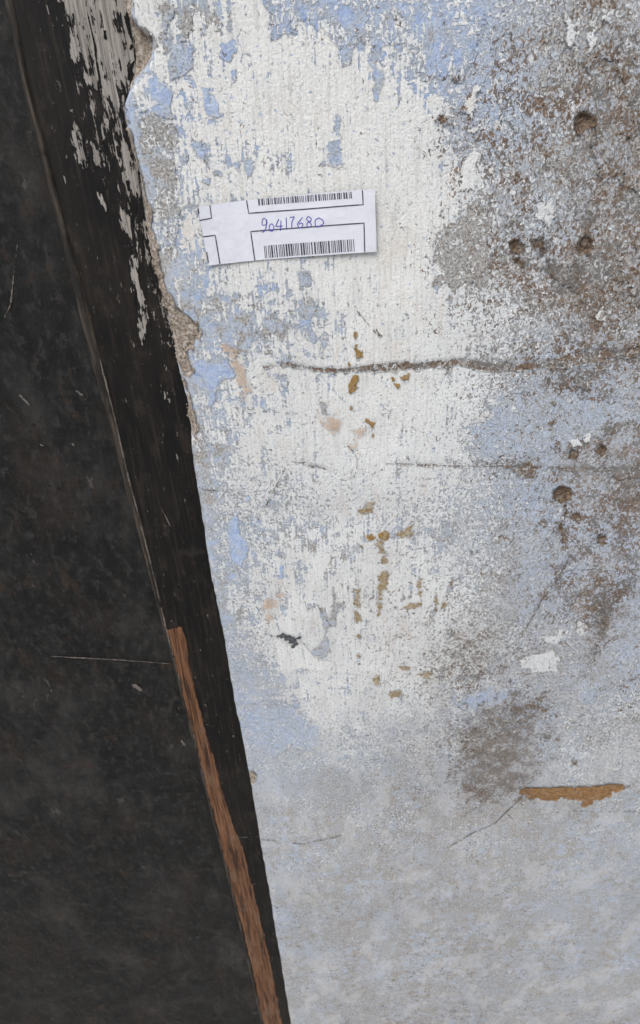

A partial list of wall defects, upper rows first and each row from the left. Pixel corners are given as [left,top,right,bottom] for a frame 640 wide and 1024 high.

peeling [316,114,346,169]
peeling [49,0,291,446]
peeling [293,256,328,360]
peeling [348,332,363,410]
crack [262,347,640,417]
corrosion [316,412,366,455]
peeling [456,369,640,543]